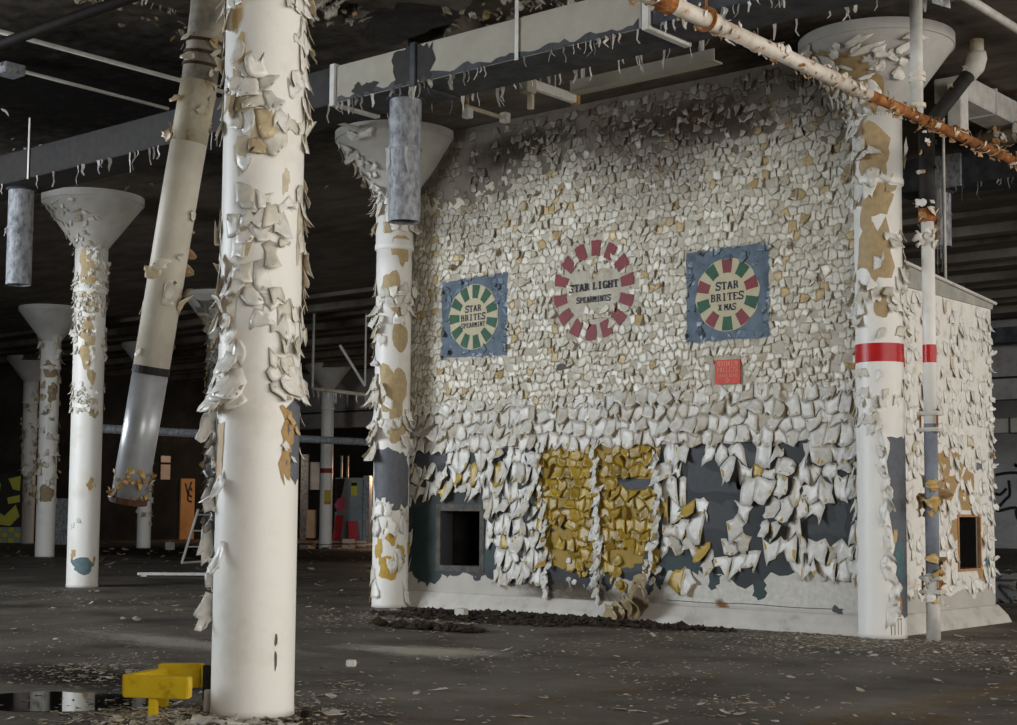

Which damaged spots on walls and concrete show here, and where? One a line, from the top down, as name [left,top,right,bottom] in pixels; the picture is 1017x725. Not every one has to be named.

peeling [18,196,111,505]
peeling [71,550,96,575]
peeling [86,463,157,526]
peeling [144,0,576,631]
peeling [337,0,1017,629]